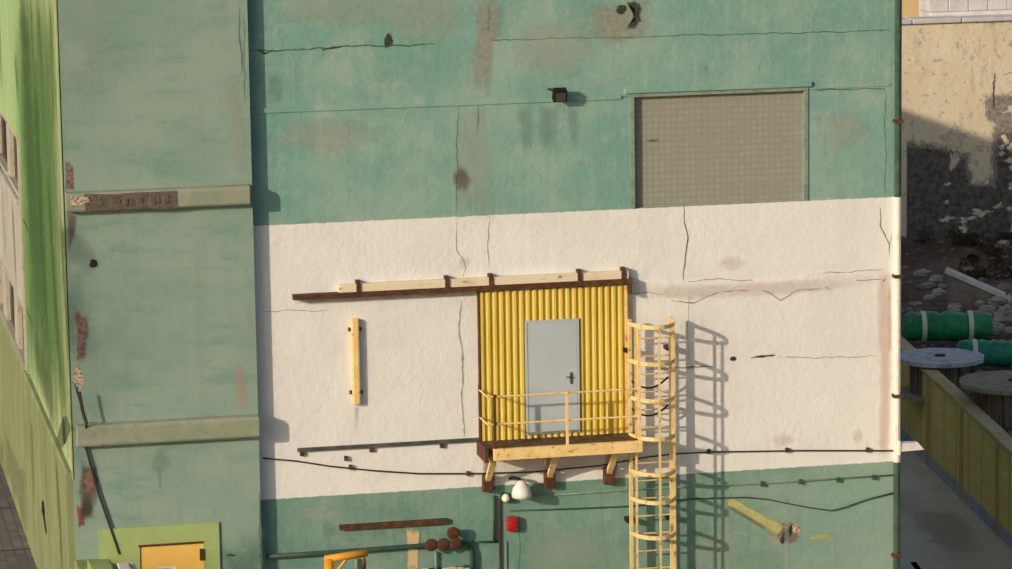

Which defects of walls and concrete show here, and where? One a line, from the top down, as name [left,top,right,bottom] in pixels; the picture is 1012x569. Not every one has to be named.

crack [238,12,427,96]
peeling [616,1,642,30]
crack [992,72,1012,108]
water stain [19,5,66,408]
peeling [66,163,178,211]
crack [456,112,479,205]
crack [456,216,490,275]
crack [634,88,892,370]
peeling [906,94,1012,241]
peeling [73,313,88,390]
crack [457,305,465,435]
spalling [77,468,97,527]